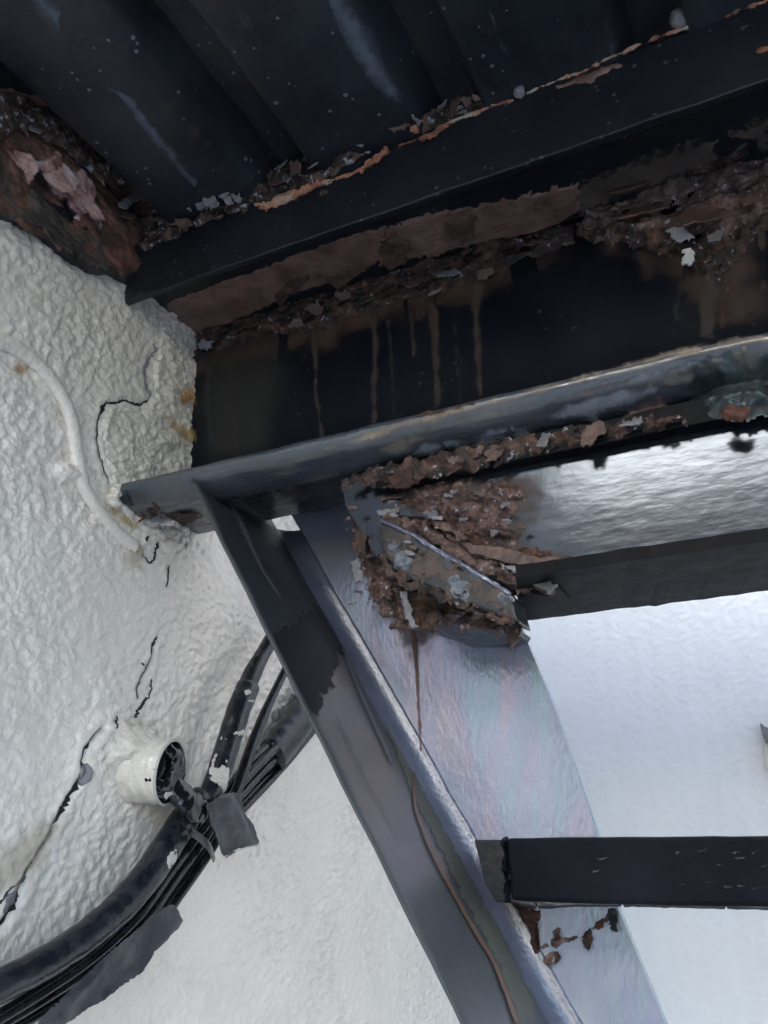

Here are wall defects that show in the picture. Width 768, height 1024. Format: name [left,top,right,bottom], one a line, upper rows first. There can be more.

peeling [329,0,397,96]
corrosion [0,88,162,280]
peeling [115,90,196,186]
crack [96,343,158,478]
corrosion [341,149,768,751]
crack [142,536,170,588]
crack [0,636,157,925]
corrosion [413,772,519,1024]
corrosion [510,902,618,966]